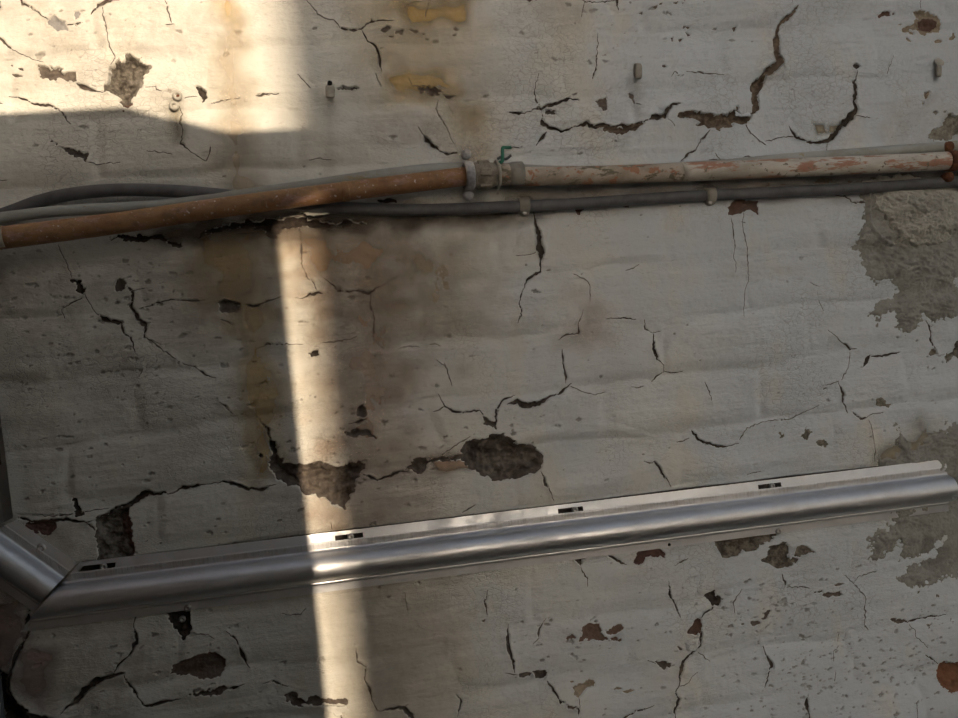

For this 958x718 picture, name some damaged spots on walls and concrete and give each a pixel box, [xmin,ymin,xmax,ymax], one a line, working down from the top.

crack [0,0,115,65]
crack [762,0,799,76]
crack [9,96,71,124]
spalling [38,53,152,112]
crack [509,73,680,148]
crack [745,70,870,157]
crack [243,237,605,427]
spalling [268,440,365,510]
spalling [407,416,543,481]
spalling [94,504,135,563]
flaking render [171,650,228,697]
flaking render [936,661,958,693]